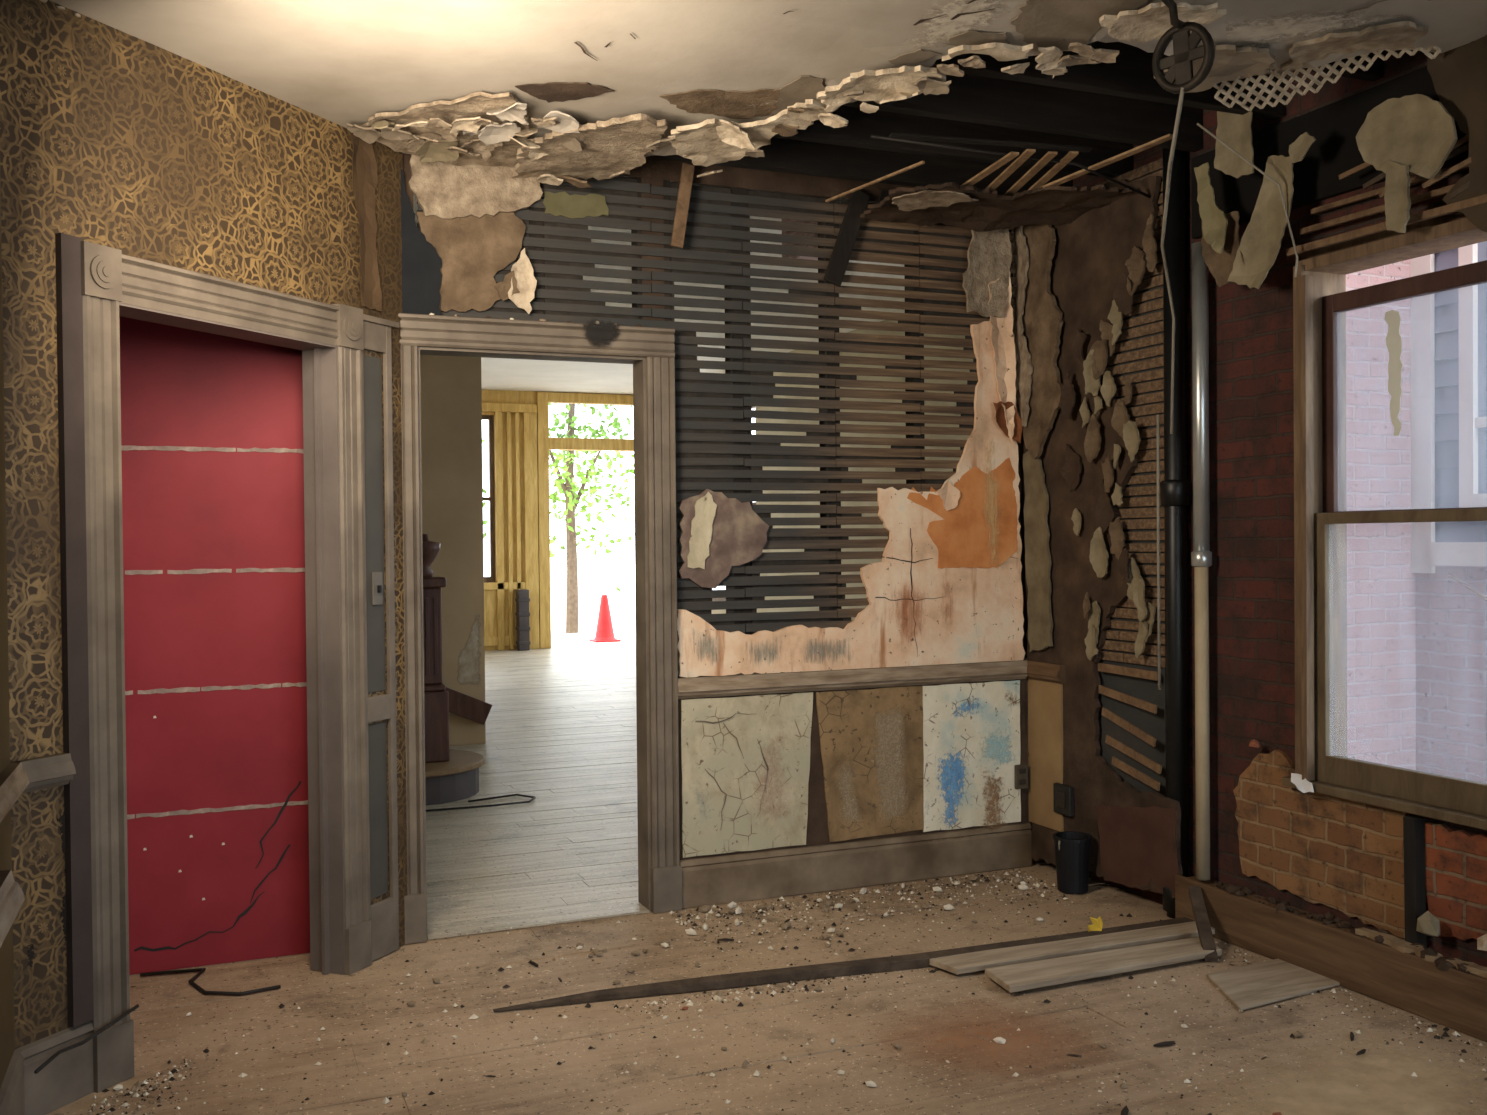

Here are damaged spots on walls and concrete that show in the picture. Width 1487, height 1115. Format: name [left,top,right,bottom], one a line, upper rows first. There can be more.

peeling [659,0,1149,158]
peeling [1226,11,1393,47]
flaking render [1191,66,1487,256]
spalling [347,82,1183,898]
crack [695,713,768,827]
damp [983,771,1004,829]
spalling [1233,750,1487,978]